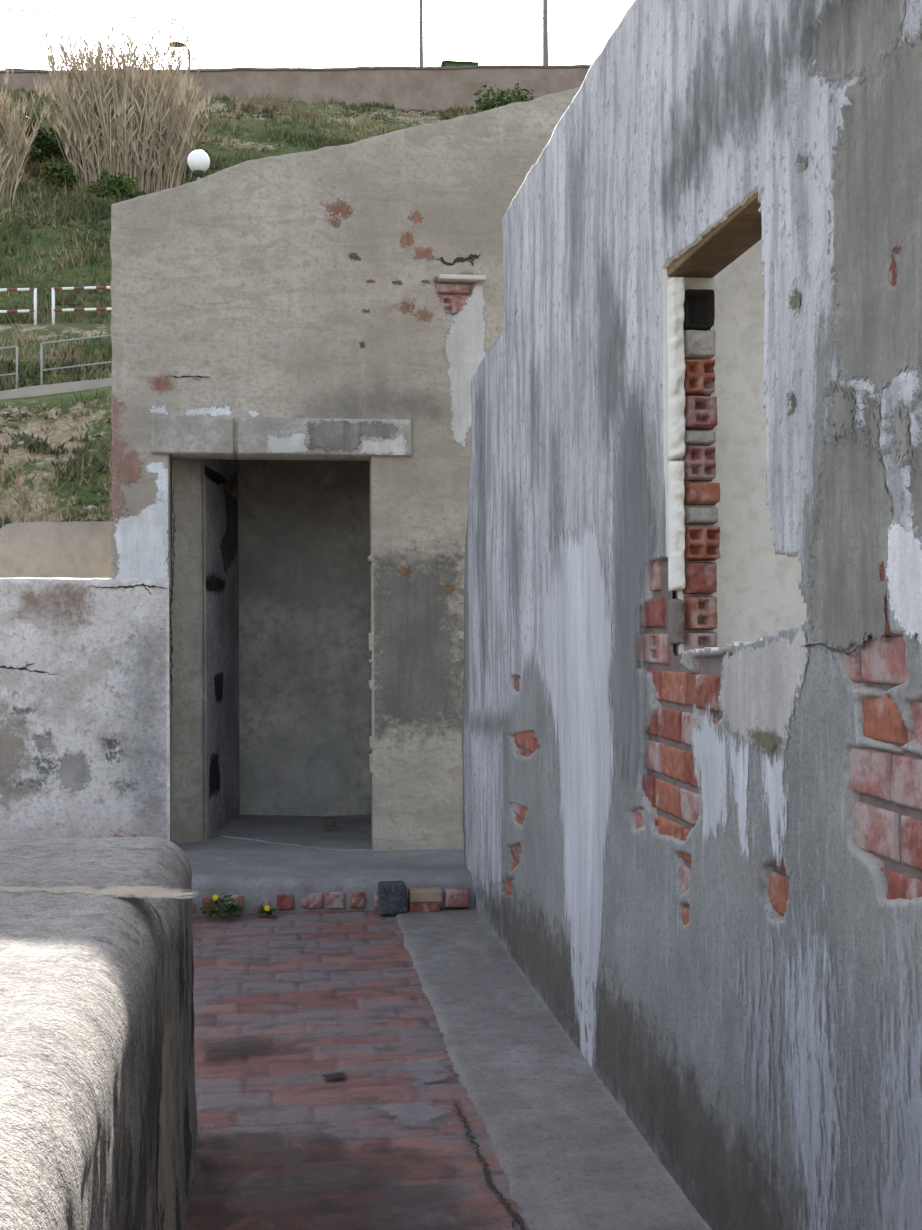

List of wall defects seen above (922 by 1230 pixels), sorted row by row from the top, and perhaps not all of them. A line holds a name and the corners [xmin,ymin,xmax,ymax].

damp [663,21,785,205]
crack [438,254,482,266]
flaking render [788,283,801,314]
peeling [104,393,168,578]
flaking render [787,390,796,417]
flaking render [801,0,922,900]
crack [0,663,58,675]
crack [87,475,176,707]
flaking render [634,560,733,925]
damp [116,1001,163,1230]
damp [178,923,271,1198]
crack [451,1095,525,1230]